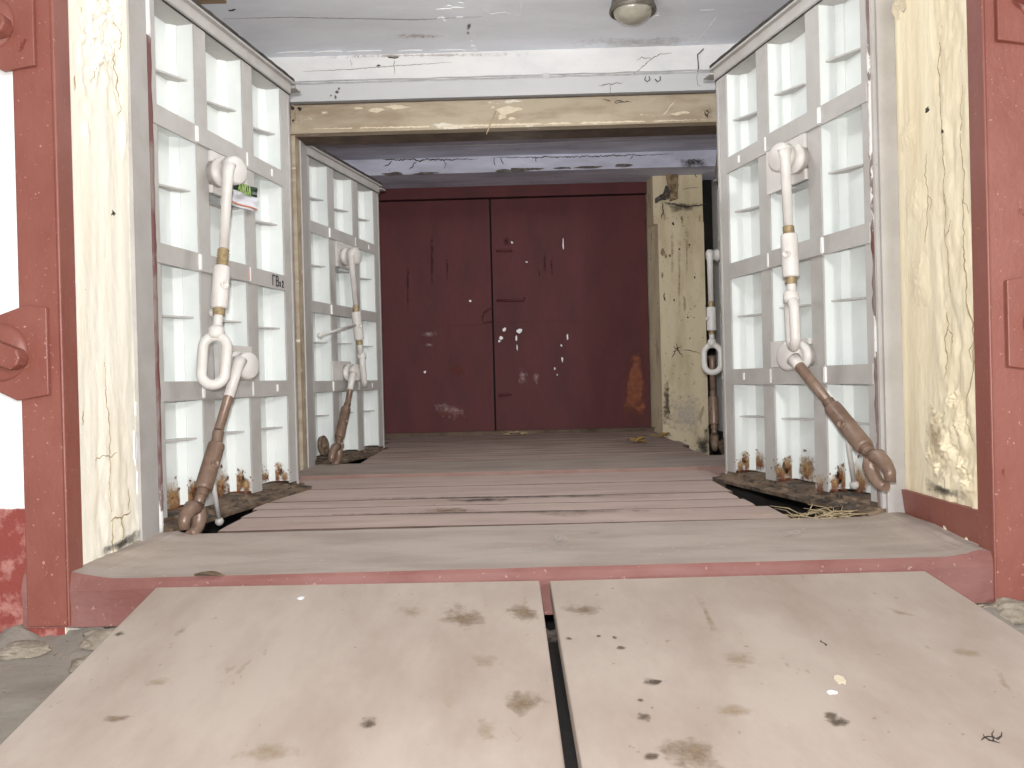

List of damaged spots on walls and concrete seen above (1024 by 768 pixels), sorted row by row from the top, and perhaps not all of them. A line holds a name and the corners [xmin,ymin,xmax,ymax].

crack [74,8,122,114]
peeling [354,105,409,113]
crack [303,52,706,218]
peeling [491,106,523,120]
crack [924,26,974,442]
corrosion [624,354,645,414]
crack [82,362,131,552]
corrosion [167,476,196,510]
corrosion [217,463,291,497]
corrosion [734,449,867,495]